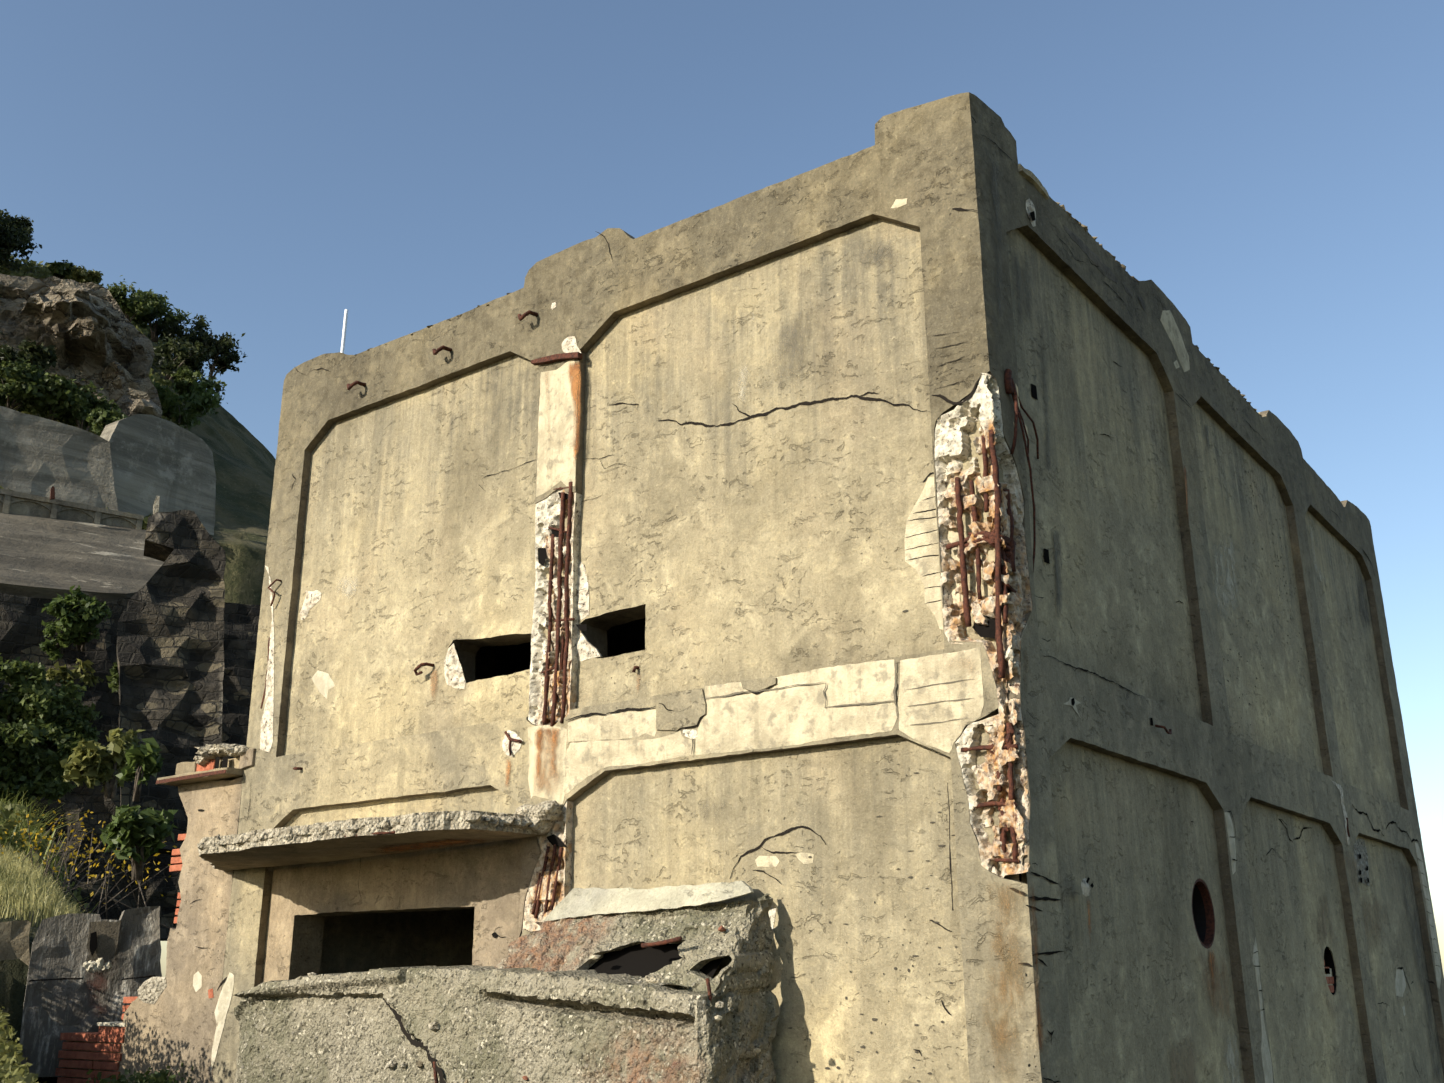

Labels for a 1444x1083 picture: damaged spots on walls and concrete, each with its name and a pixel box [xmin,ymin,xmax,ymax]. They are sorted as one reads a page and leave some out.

crack [611,332,982,427]
spalling [502,336,1032,932]
crack [730,826,826,884]
spalling [193,971,234,1073]
crack [383,998,446,1083]
spalling [589,936,682,978]
spalling [700,958,723,1001]
rust [1033,896,1042,1050]